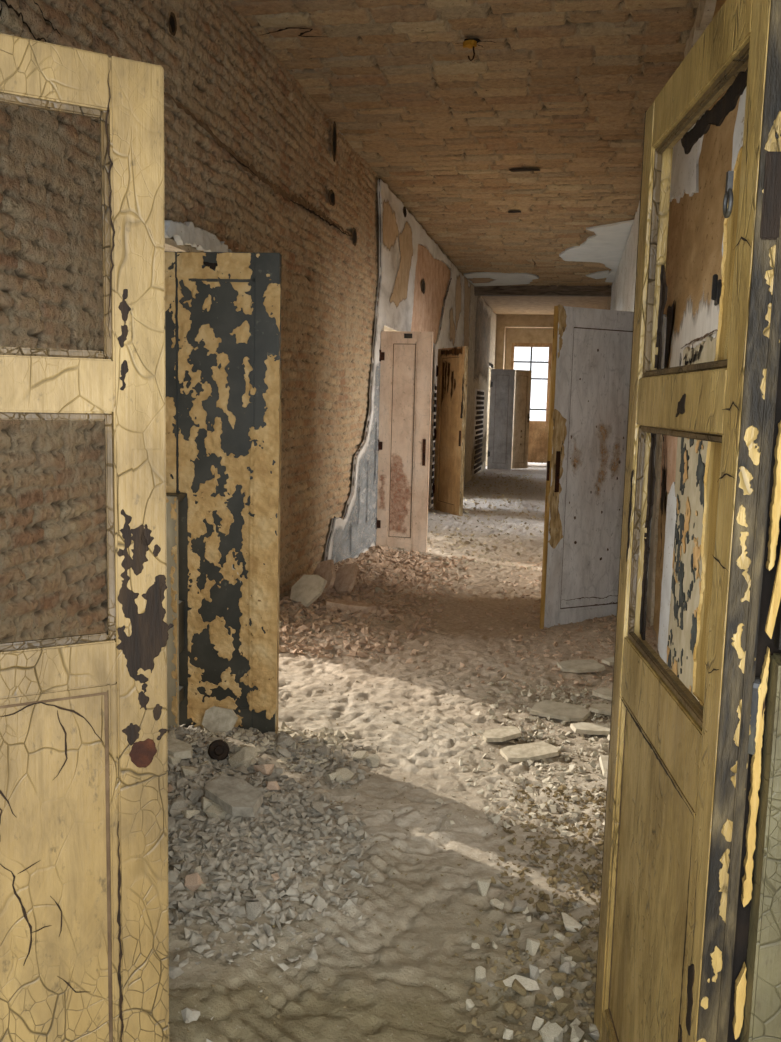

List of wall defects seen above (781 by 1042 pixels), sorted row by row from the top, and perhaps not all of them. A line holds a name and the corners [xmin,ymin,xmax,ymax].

peeling [117,220,281,740]
peeling [324,179,539,564]
peeling [559,201,640,312]
peeling [122,723,141,746]